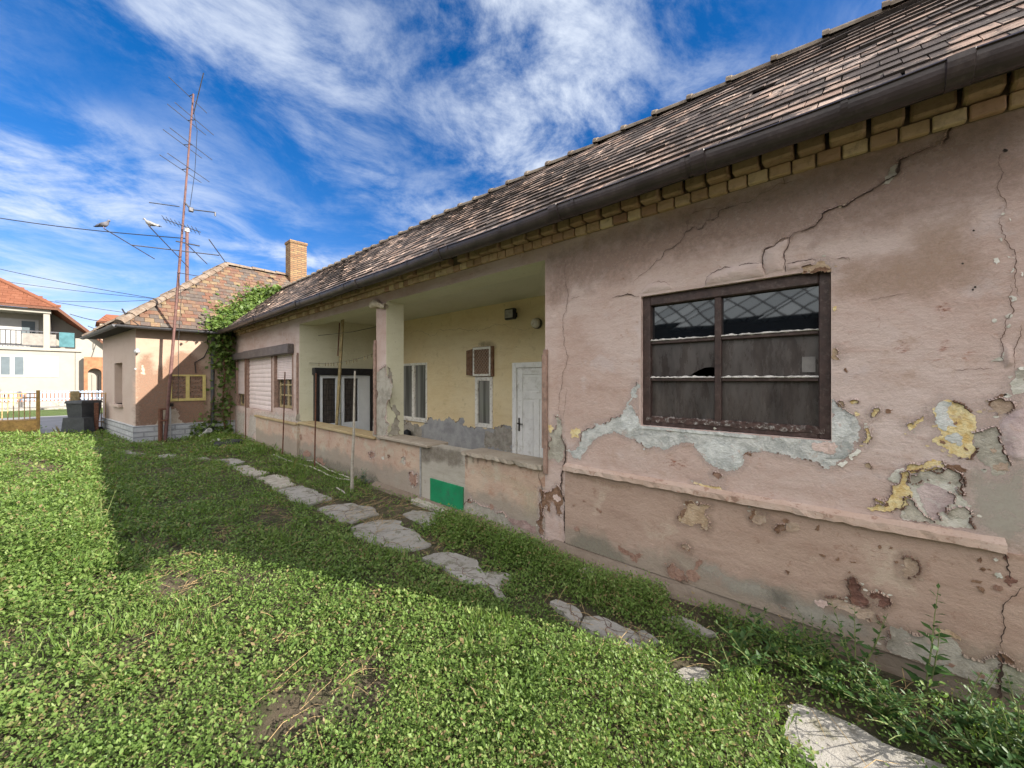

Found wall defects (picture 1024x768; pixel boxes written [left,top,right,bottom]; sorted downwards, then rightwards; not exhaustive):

crack [613,177,792,298]
crack [705,127,952,283]
crack [961,150,1022,371]
flaking render [369,366,418,488]
flaking render [464,484,585,539]
crack [538,253,577,543]
flaking render [677,500,711,531]
flaking render [548,381,892,490]
flaking render [878,545,924,581]
flaking render [814,554,1024,698]
peeling [868,367,1024,529]
crack [997,554,1021,699]